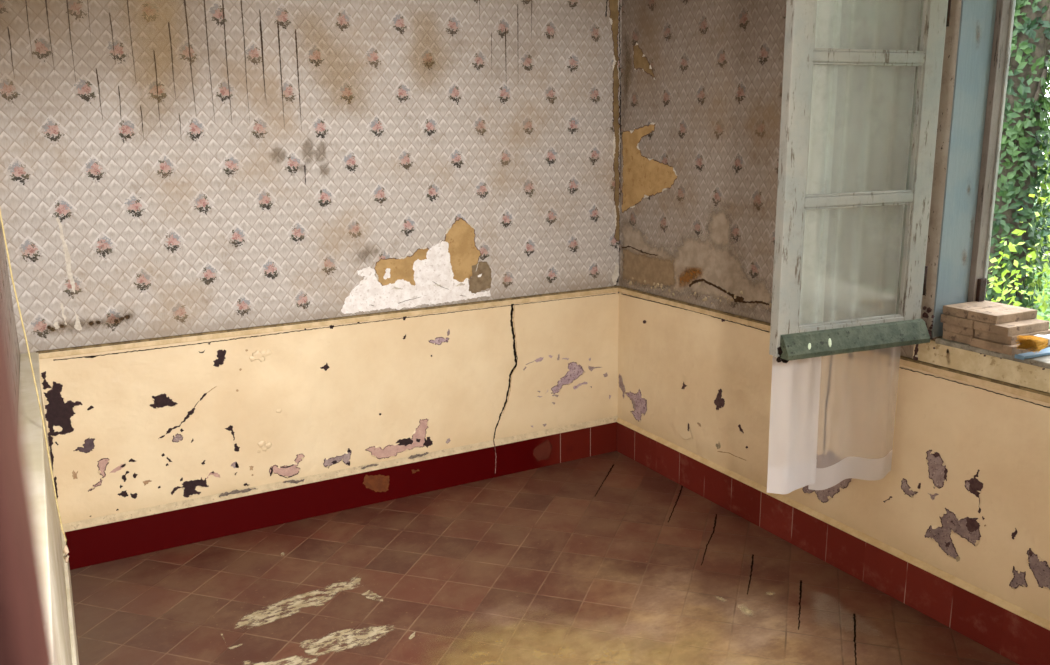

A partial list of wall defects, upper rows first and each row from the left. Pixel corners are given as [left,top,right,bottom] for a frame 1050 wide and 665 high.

damp [184,0,196,111]
damp [222,0,232,120]
flaking render [341,227,491,323]
crack [619,218,658,256]
peeling [40,371,94,498]
peeling [73,437,220,499]
peeling [150,393,178,409]
crack [53,277,769,473]
crack [701,514,717,566]
crack [746,554,754,595]
crack [823,353,1050,456]
peeling [925,469,986,562]